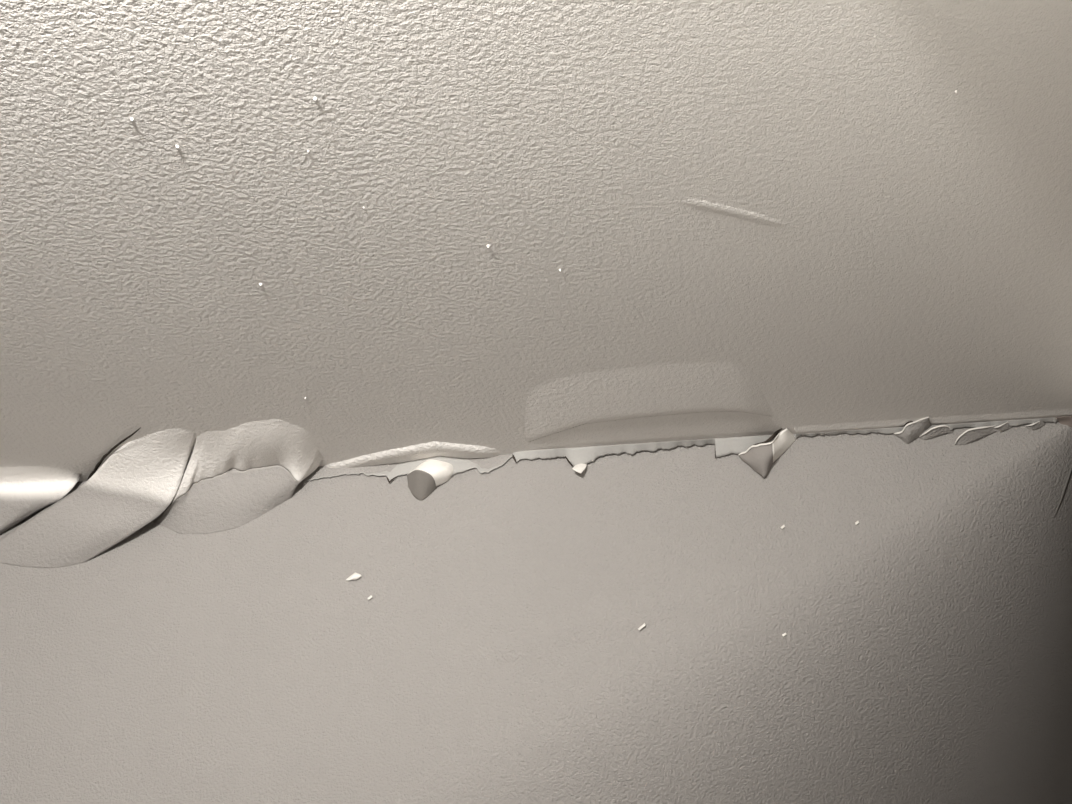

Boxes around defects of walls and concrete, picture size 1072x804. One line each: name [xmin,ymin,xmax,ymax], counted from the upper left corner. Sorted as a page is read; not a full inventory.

peeling [738,409,1072,478]
peeling [407,459,454,501]